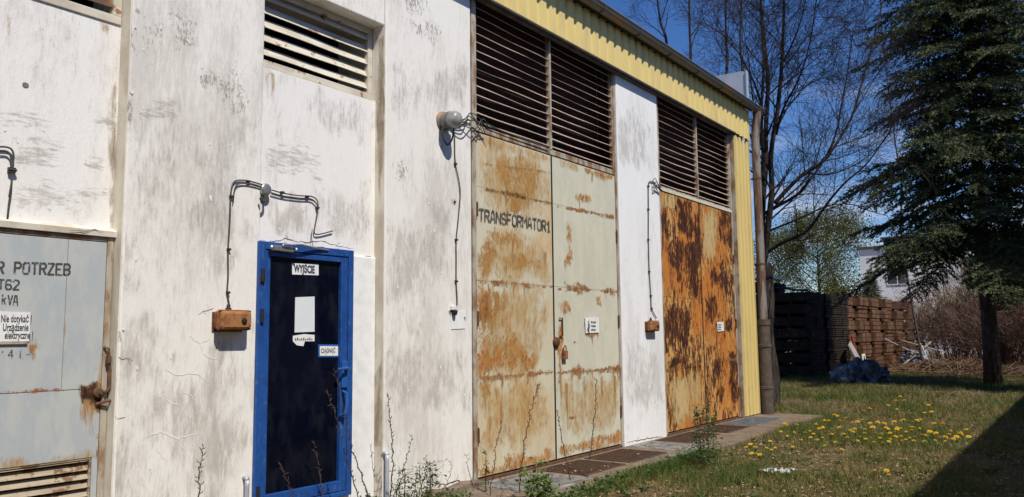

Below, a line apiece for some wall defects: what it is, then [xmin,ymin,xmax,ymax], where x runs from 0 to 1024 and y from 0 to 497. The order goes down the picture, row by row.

rust [79,379,101,421]
rust [477,231,621,476]
rust [661,195,738,425]